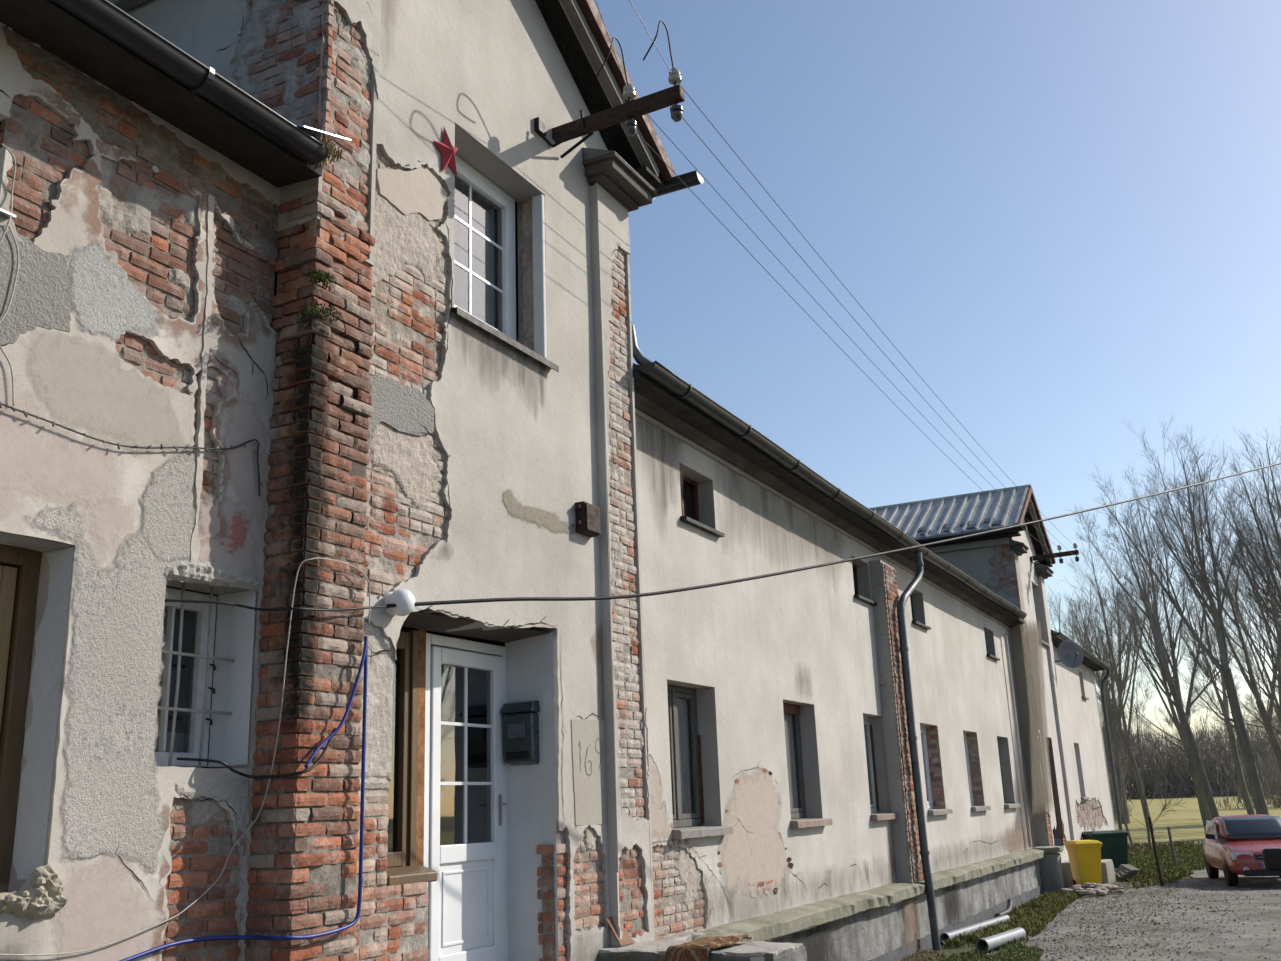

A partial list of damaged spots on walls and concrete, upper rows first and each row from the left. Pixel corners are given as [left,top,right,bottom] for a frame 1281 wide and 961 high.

flaking render [0,26,279,335]
crack [210,335,268,400]
flaking render [231,0,451,598]
flaking render [556,242,705,961]
flaking render [986,544,1021,603]
flaking render [0,777,251,961]
peeling [718,768,794,897]
flaking render [1043,798,1107,846]